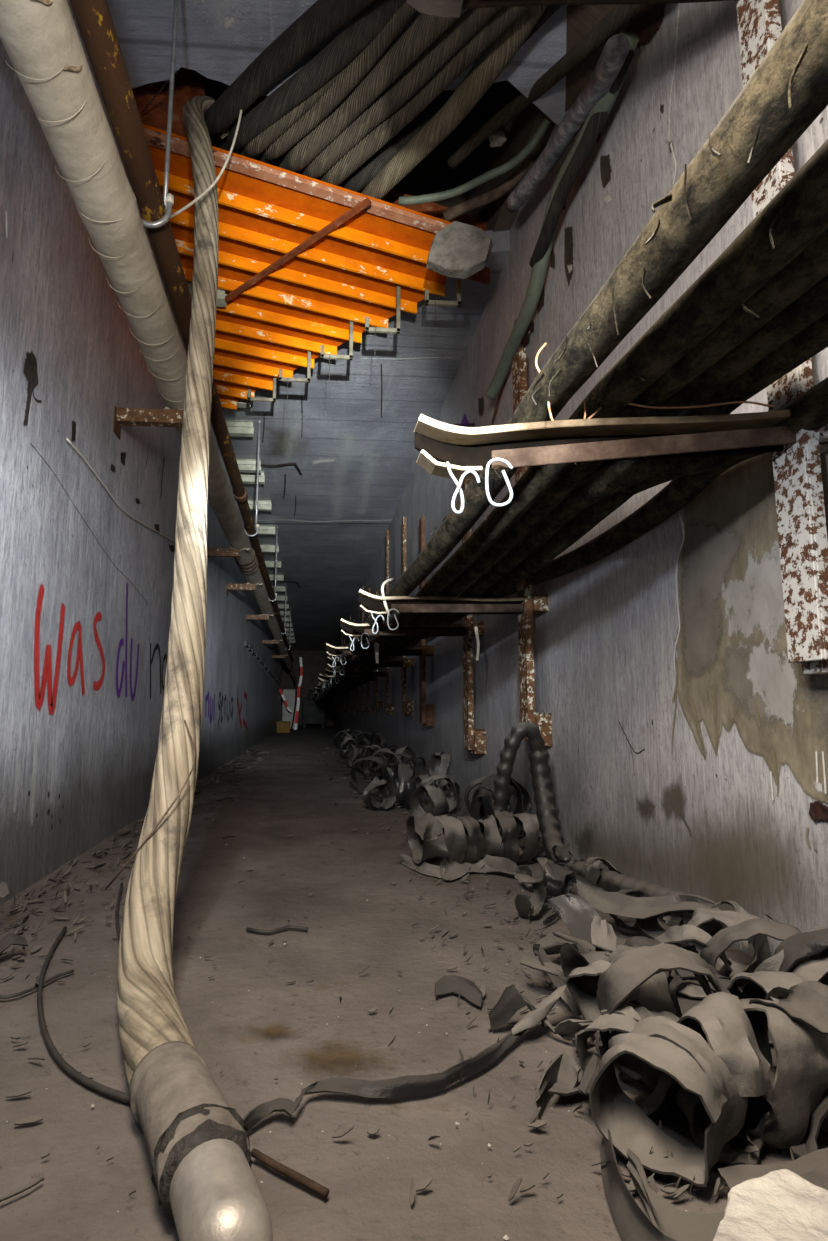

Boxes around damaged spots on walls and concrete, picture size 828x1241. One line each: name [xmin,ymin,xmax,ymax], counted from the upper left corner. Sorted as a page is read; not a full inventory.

flaking render [671,452,828,804]
corrosion [806,783,828,850]